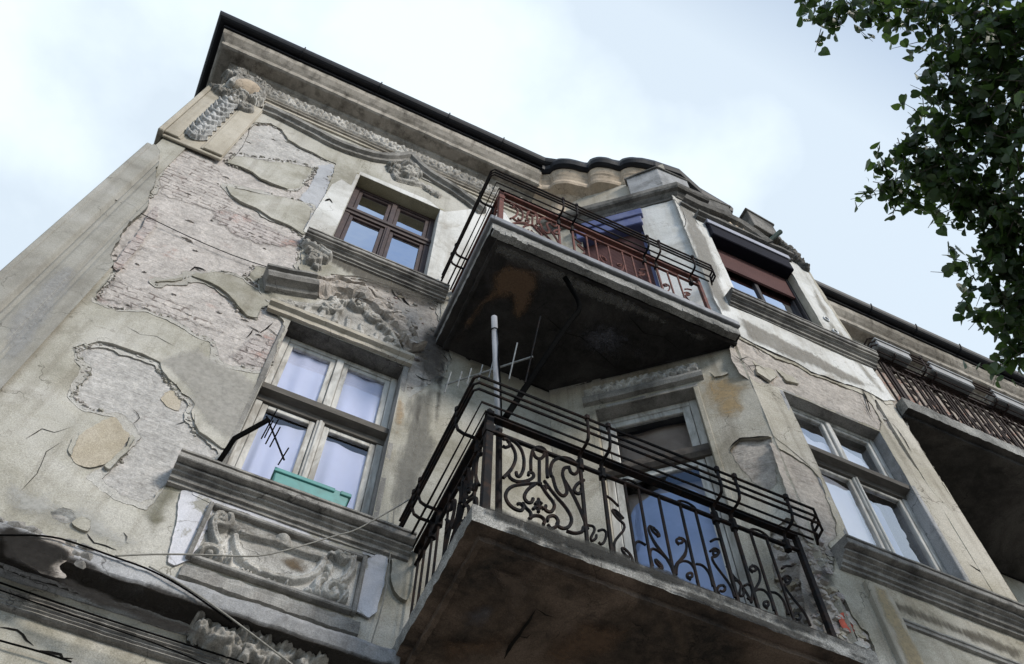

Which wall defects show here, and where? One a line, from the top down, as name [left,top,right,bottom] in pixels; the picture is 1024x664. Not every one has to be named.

flaking render [91,123,336,377]
corrosion [482,266,536,317]
crack [25,427,70,486]
flaking render [67,334,229,510]
water stain [395,327,444,503]
crack [730,436,814,469]
crack [733,341,911,451]
flaking render [0,502,94,578]
flaking render [731,439,872,650]